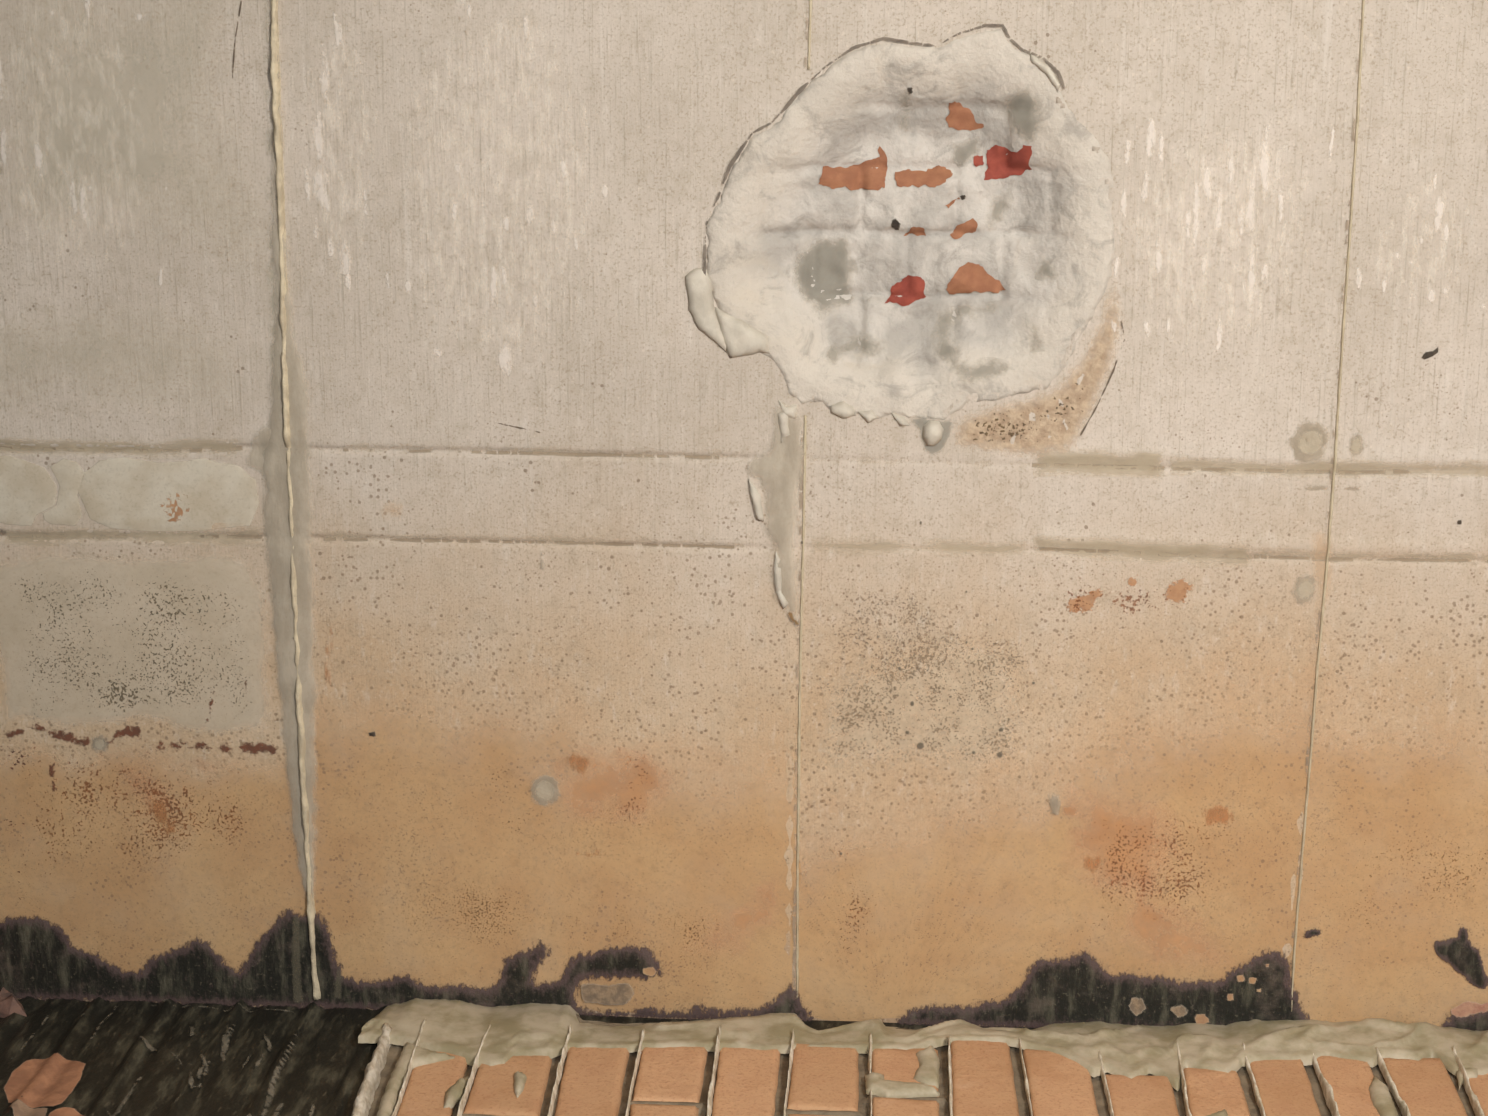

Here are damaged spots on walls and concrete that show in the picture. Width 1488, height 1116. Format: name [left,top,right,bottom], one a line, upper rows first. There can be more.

spalling [685,24,1118,453]
damp [1124,121,1164,163]
damp [1186,128,1283,272]
damp [0,530,277,754]
damp [391,538,734,549]
rust [1066,577,1193,614]
damp [1037,539,1488,563]
rust [0,720,1488,1027]